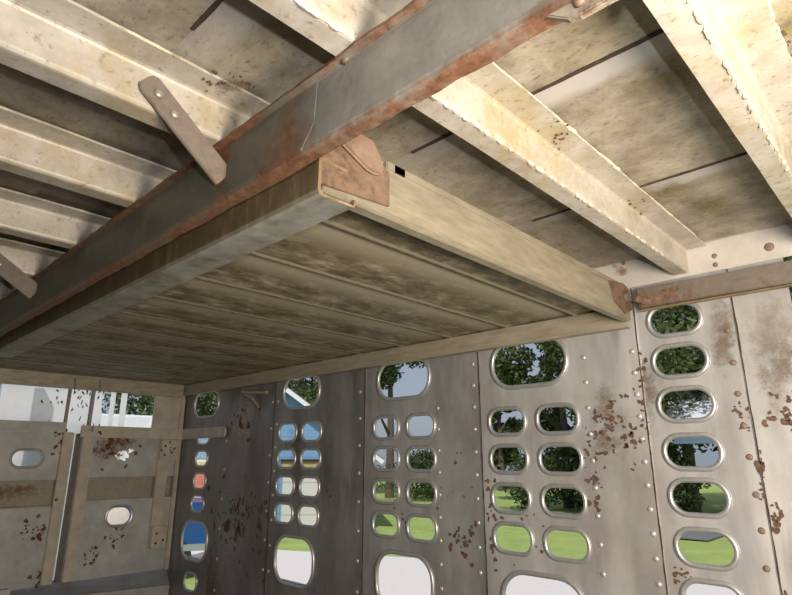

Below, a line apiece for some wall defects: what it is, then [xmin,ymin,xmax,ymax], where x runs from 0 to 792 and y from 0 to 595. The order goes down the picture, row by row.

corrosion [91,427,142,471]